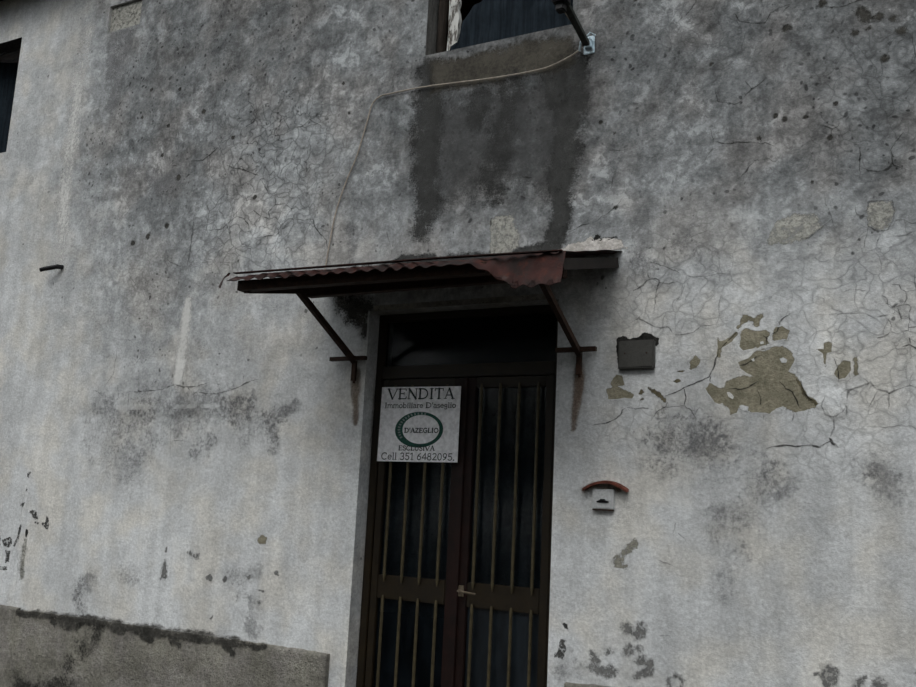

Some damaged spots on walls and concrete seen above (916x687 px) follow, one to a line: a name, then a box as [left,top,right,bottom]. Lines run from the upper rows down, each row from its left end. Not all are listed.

crack [168,103,327,267]
water stain [354,36,603,267]
crack [706,129,774,173]
crack [859,132,904,172]
crack [869,284,916,349]
peeling [603,332,666,405]
crack [594,332,737,425]
peeling [674,314,824,420]
peeling [810,335,859,385]
crack [769,438,835,448]
peeling [0,503,49,570]
water stain [13,609,267,687]